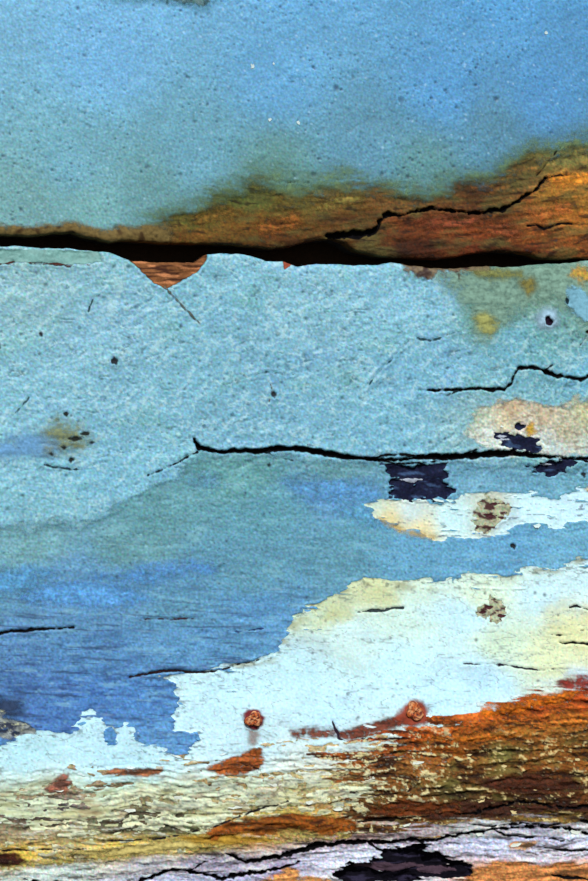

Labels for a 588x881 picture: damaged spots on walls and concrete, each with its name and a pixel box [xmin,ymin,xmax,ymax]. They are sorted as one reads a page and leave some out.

rust [146,130,588,262]
crack [427,364,588,395]
crack [147,438,588,476]
crack [0,626,75,635]
peeling [0,395,588,881]
rust [207,675,588,841]
crack [349,788,412,796]
crack [2,846,86,854]
crack [110,800,289,842]
crack [139,800,588,881]